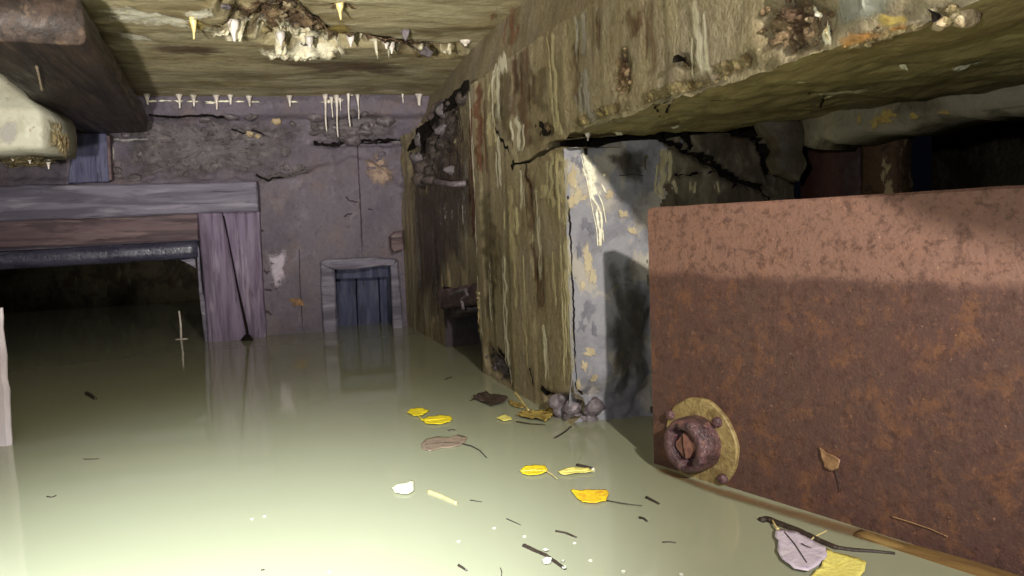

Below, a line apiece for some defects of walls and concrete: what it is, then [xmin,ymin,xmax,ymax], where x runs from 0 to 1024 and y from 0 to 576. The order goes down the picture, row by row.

damp [99,6,451,61]
spalling [757,0,836,54]
spalling [843,24,916,48]
spalling [928,3,961,32]
damp [547,34,563,135]
crack [149,114,266,136]
crack [314,80,470,258]
crack [495,127,533,207]
crack [560,101,770,200]
damp [415,53,613,394]
flaking render [269,250,286,290]
rust [663,470,870,537]